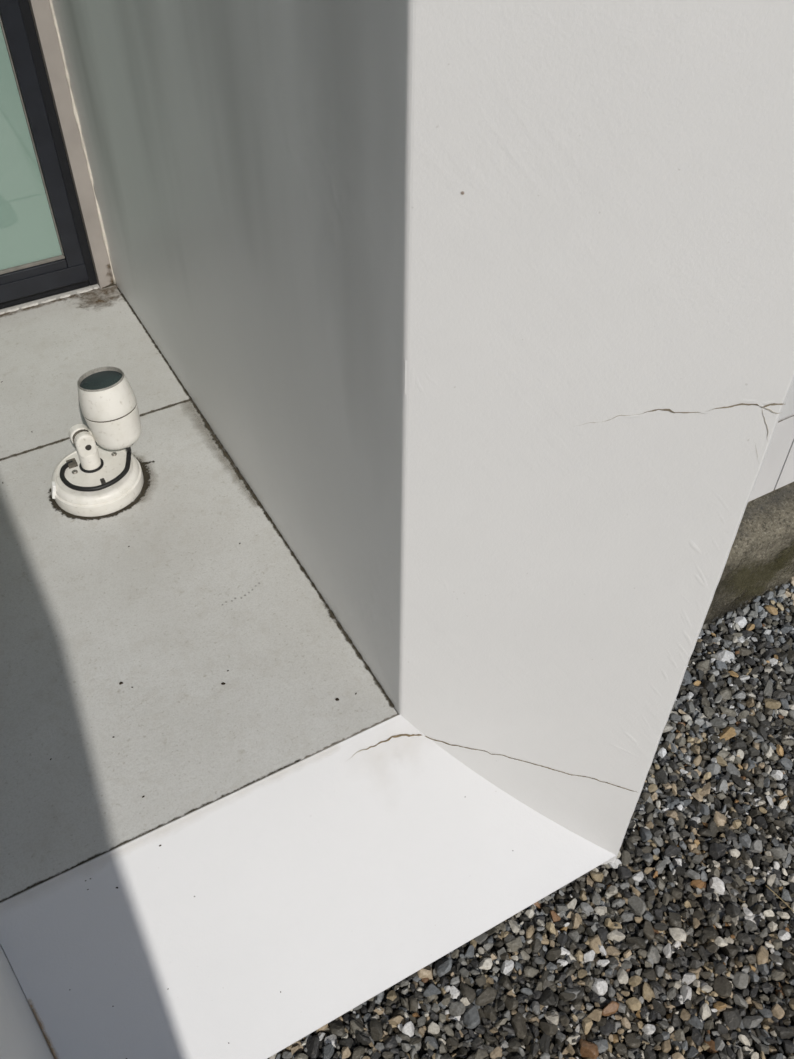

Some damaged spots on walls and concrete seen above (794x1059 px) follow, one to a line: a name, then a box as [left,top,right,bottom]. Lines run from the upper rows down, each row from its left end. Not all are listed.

crack [579,399,784,457]
crack [351,734,636,792]